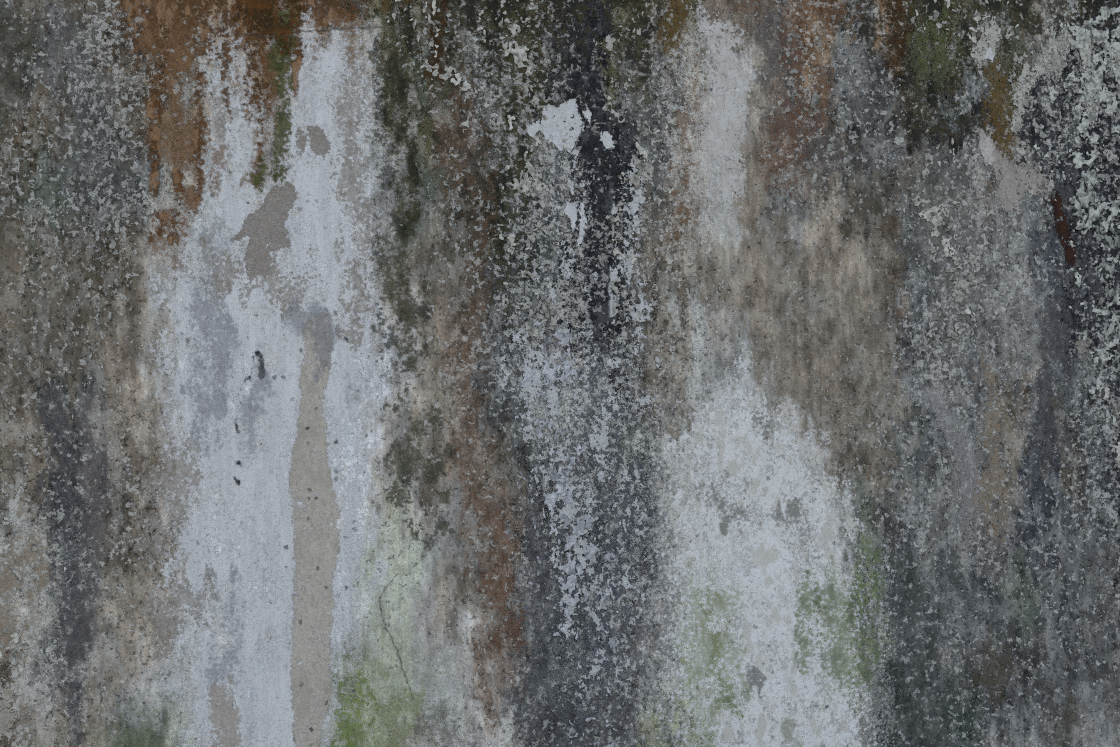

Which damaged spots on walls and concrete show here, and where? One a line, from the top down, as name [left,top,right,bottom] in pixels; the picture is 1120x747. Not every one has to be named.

rust [112,0,390,246]
rust [419,0,450,95]
peeling [387,0,675,661]
peeling [896,0,1120,545]
rust [1050,192,1077,266]
peeling [288,312,340,747]
water stain [577,383,657,644]